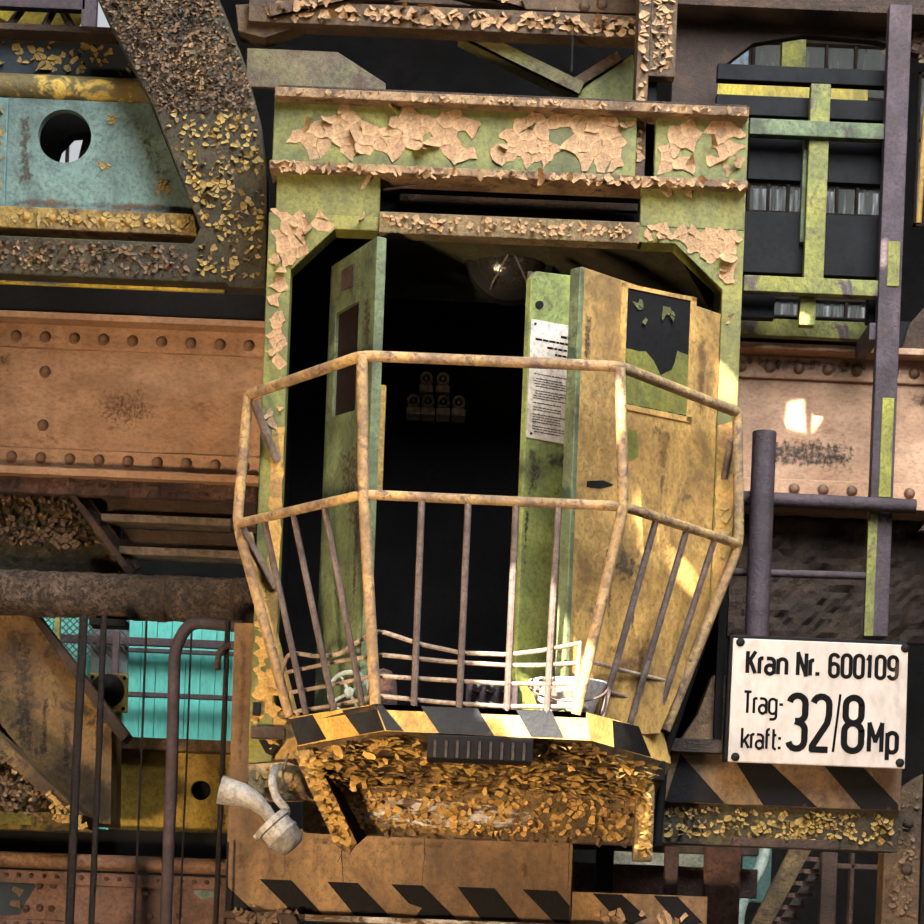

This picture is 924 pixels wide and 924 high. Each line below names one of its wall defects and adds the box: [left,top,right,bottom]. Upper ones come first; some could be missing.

peeling [0,0,750,369]
peeling [0,882,36,915]